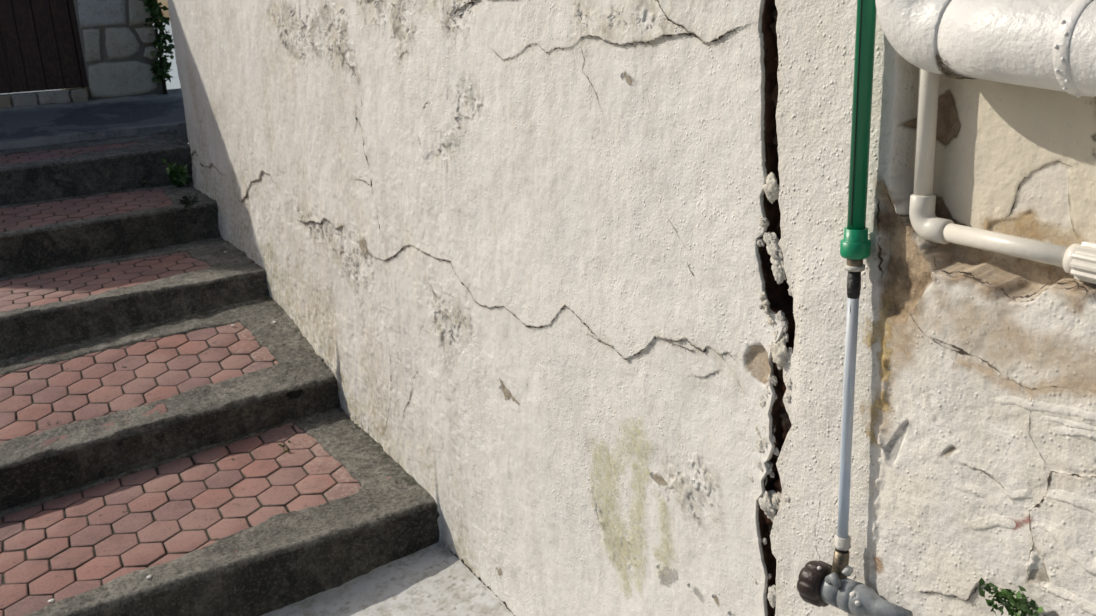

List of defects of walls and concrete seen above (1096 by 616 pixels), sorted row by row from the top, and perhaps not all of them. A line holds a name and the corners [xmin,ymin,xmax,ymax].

crack [497,0,779,138]
flaking render [936,90,961,145]
flaking render [935,197,965,226]
crack [376,134,795,545]
crack [910,314,1096,584]
crack [448,548,515,616]
crack [754,573,777,609]
crack [924,584,985,601]